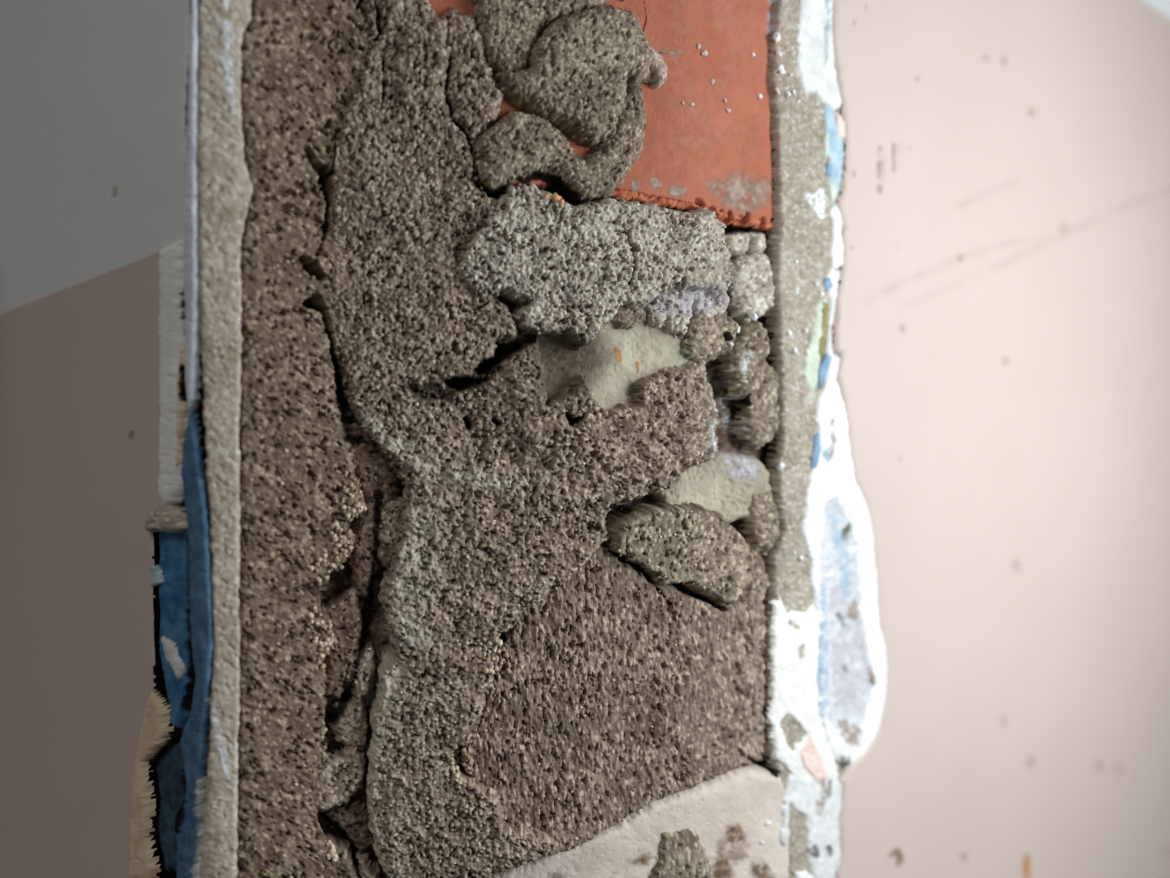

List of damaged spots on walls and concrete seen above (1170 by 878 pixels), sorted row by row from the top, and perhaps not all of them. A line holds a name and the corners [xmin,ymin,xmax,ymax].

crack [311,141,337,233]
crack [445,58,584,206]
crack [722,226,766,237]
crack [301,264,364,445]
peeling [766,0,887,878]
crack [587,497,724,612]
crack [318,489,384,878]